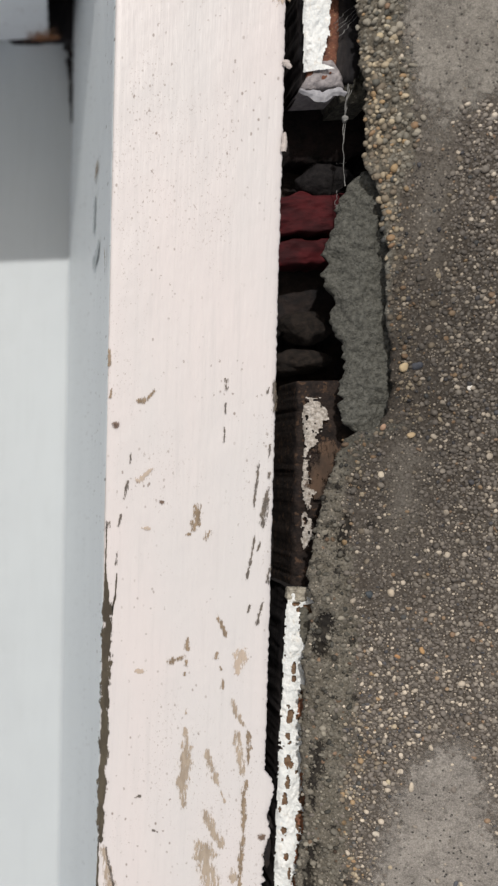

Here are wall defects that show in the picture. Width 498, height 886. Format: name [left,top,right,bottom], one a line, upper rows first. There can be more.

peeling [298,87,347,102]
spalling [271,171,393,586]
peeling [96,525,117,886]
peeling [166,637,190,676]